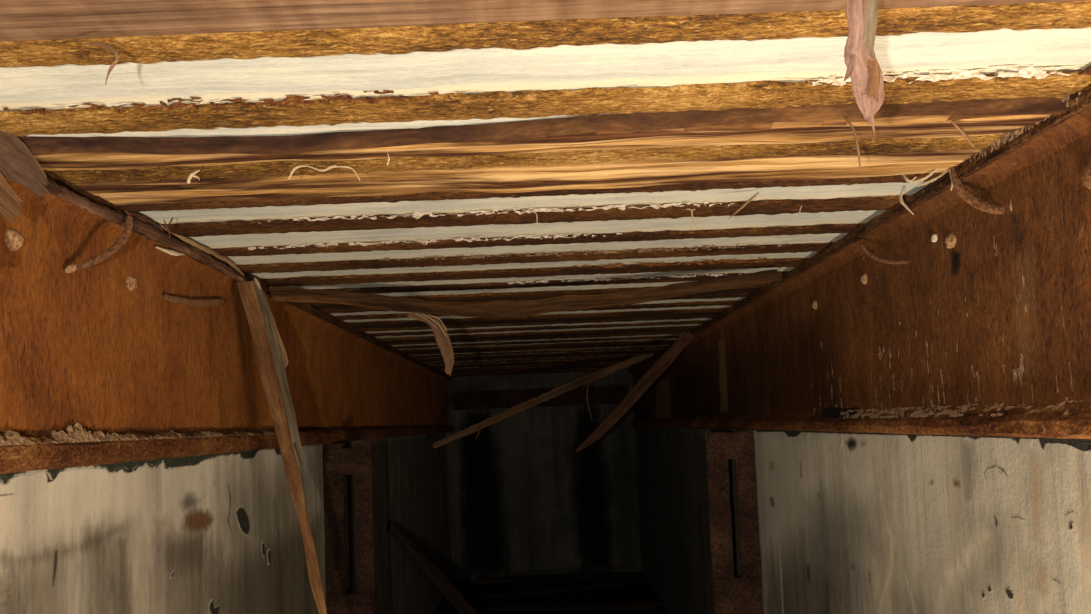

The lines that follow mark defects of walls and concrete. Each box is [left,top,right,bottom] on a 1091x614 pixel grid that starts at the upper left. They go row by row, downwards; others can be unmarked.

peeling [916,331,958,408]
peeling [1002,353,1034,403]
rust [185,511,212,530]